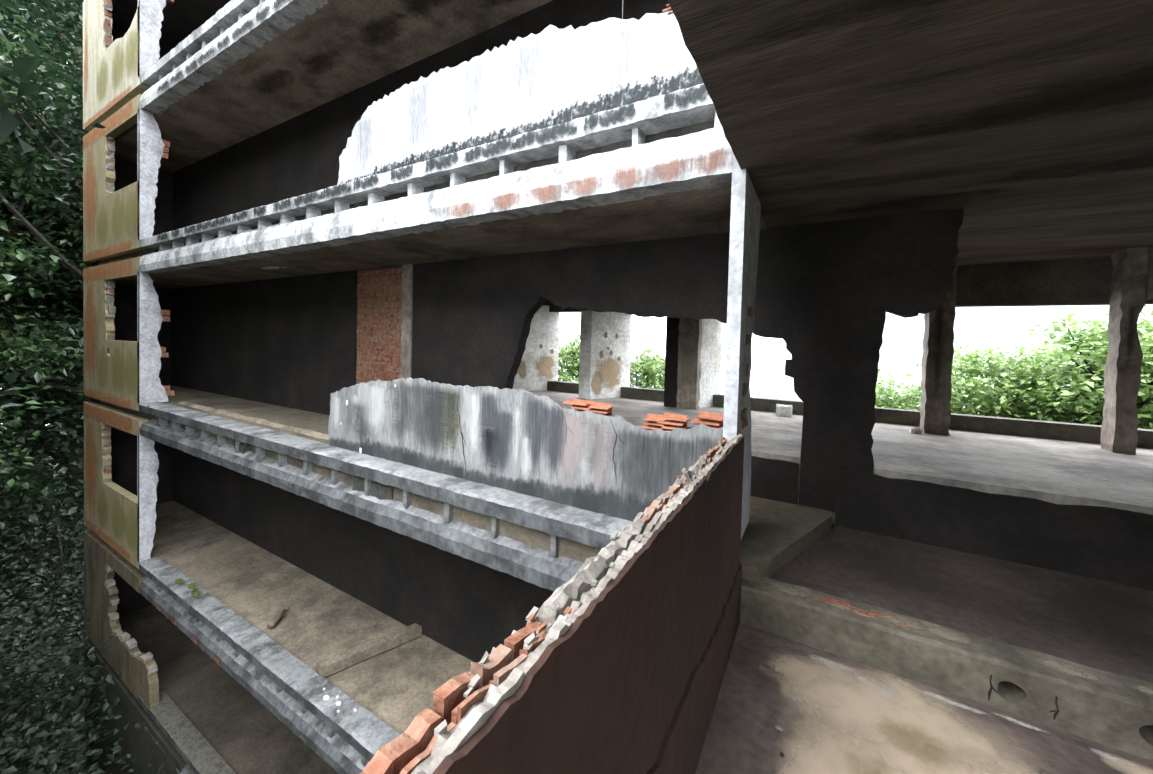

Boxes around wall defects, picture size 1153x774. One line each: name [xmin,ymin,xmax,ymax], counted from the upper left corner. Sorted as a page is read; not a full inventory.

damp [157,66,708,241]
rust [494,192,517,208]
rust [532,149,726,202]
damp [330,384,715,522]
spalling [641,411,737,517]
spalling [105,565,158,675]
peeling [523,606,552,651]
peeling [463,651,489,698]
peeling [434,719,447,738]